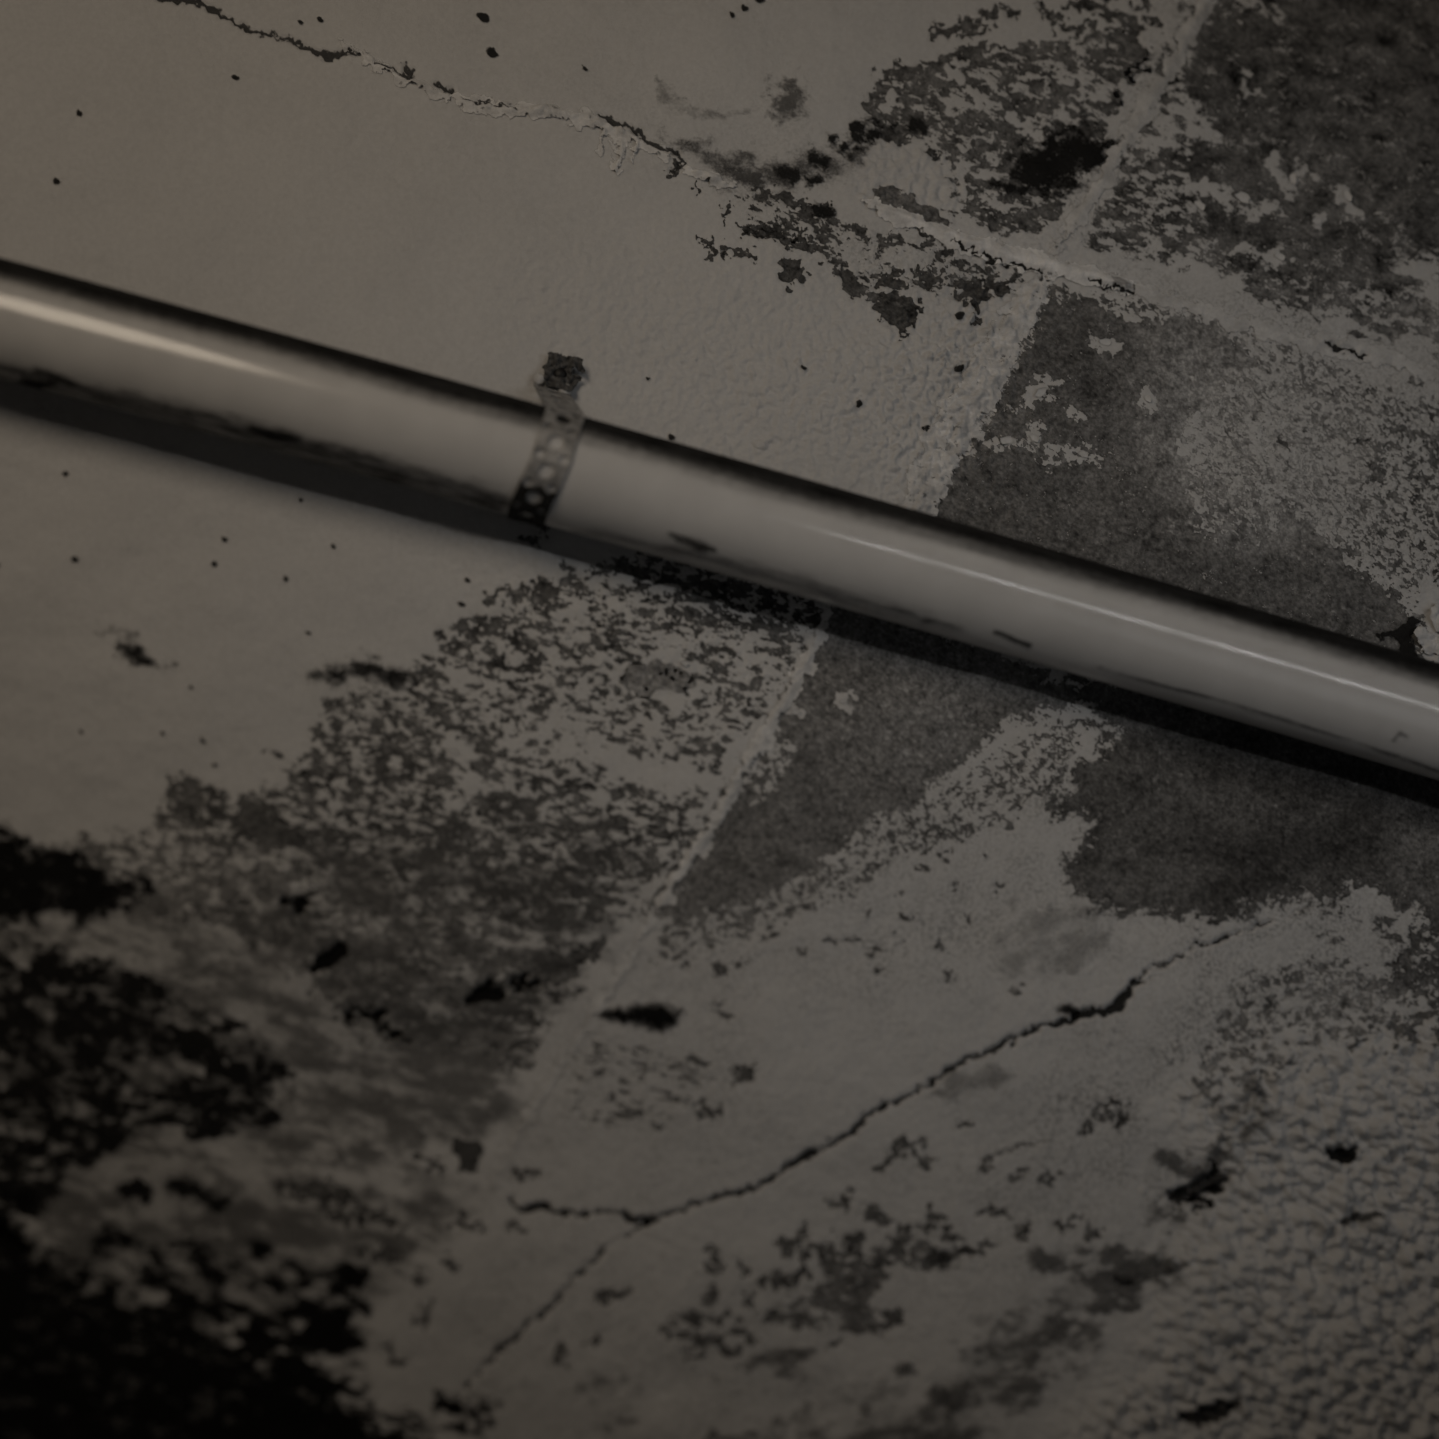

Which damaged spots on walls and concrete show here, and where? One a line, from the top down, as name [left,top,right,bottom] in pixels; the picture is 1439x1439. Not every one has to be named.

crack [158,0,517,110]
crack [598,114,687,172]
peeling [664,158,683,179]
peeling [696,0,1439,661]
peeling [72,551,1094,1073]
damp [0,825,503,1439]
peeling [561,1041,760,1132]
crack [456,921,1271,1399]
peeling [872,1131,939,1173]
peeling [1077,1095,1132,1137]
peeling [1178,918,1439,1110]
peeling [659,1186,996,1369]